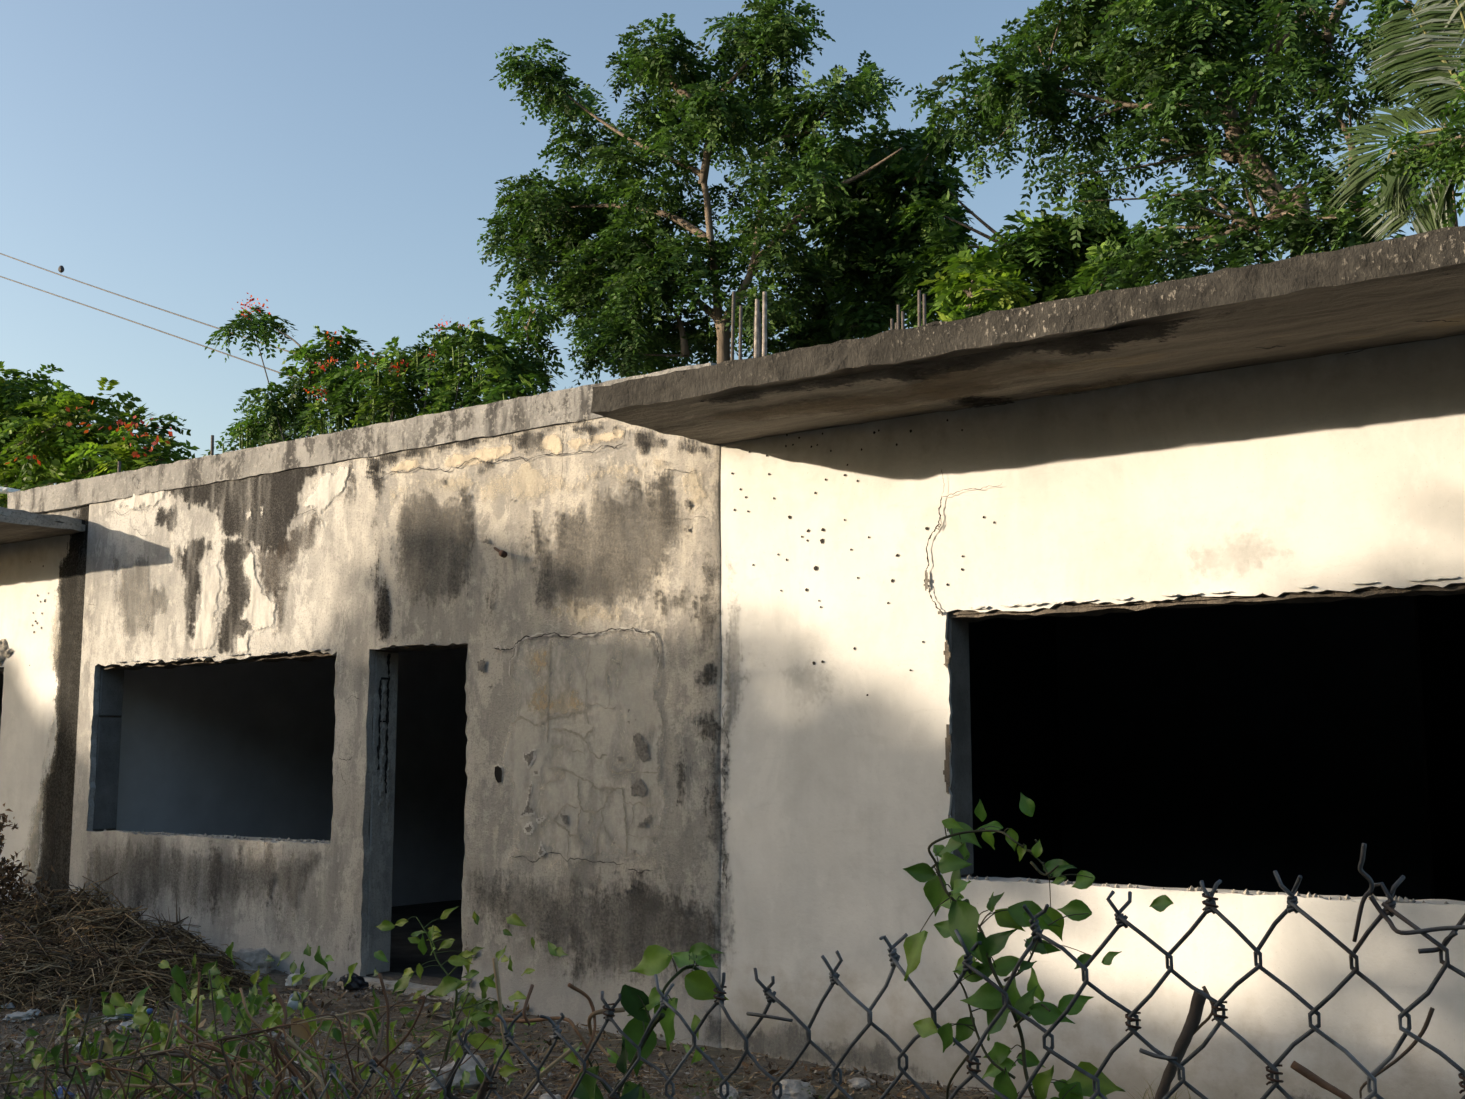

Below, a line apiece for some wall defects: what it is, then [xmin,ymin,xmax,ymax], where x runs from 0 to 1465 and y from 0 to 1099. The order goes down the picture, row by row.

water stain [701,316,1196,420]
water stain [155,465,324,655]
peeling [391,459,417,498]
water stain [370,487,474,640]
water stain [344,422,617,502]
peeling [434,444,566,502]
peeling [542,429,624,455]
peeling [682,469,705,532]
crack [924,470,1003,616]
flaking render [0,639,14,666]
water stain [22,505,312,910]
crack [493,627,664,874]